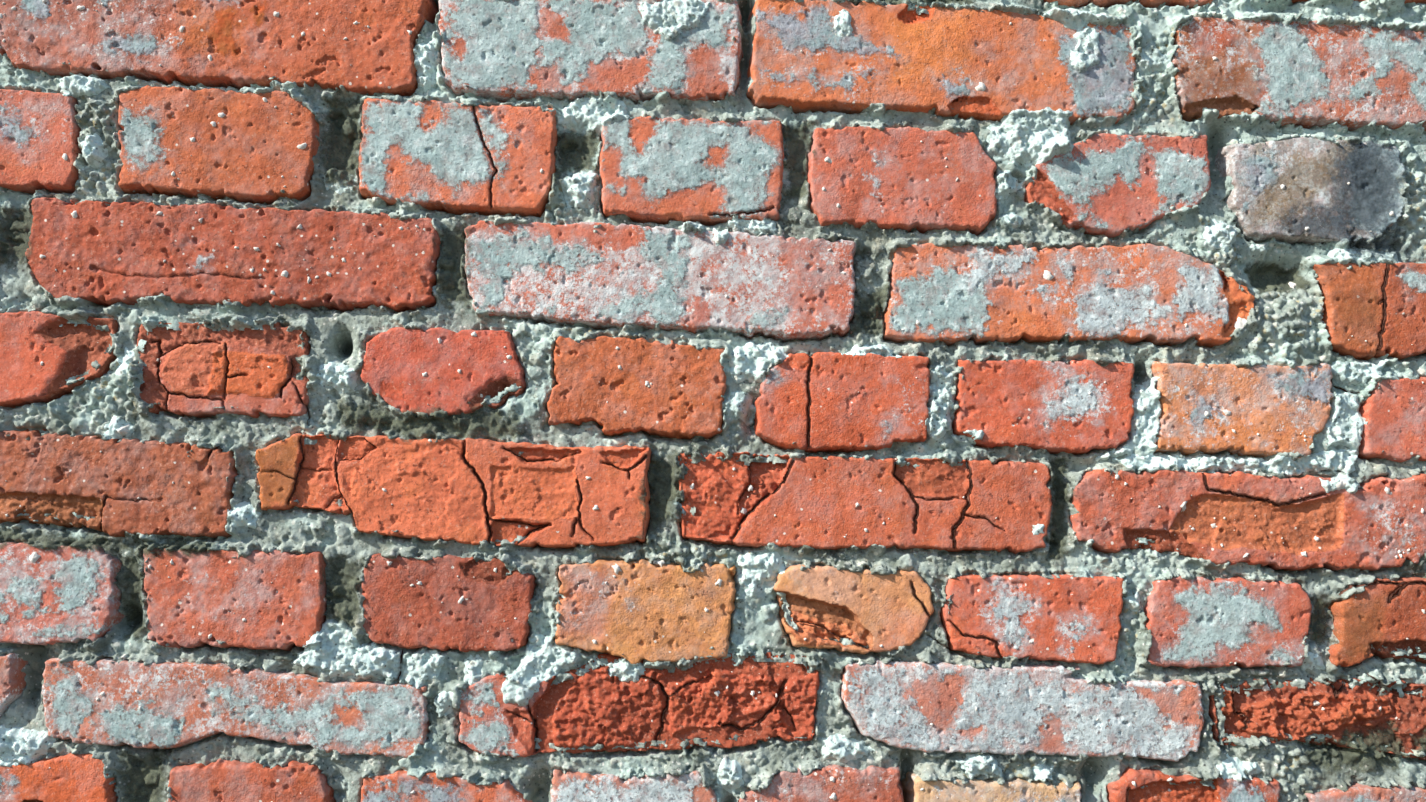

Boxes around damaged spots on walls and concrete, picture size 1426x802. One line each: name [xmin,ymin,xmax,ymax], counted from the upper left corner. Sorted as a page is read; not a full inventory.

crack [473,105,497,207]
crack [1376,264,1389,354]
crack [151,341,248,410]
crack [262,358,377,526]
crack [462,443,646,543]
crack [732,352,812,543]
crack [893,460,1004,548]
crack [1204,470,1351,506]
crack [639,676,710,742]
crack [718,681,795,731]
spalling [459,580,1426,762]